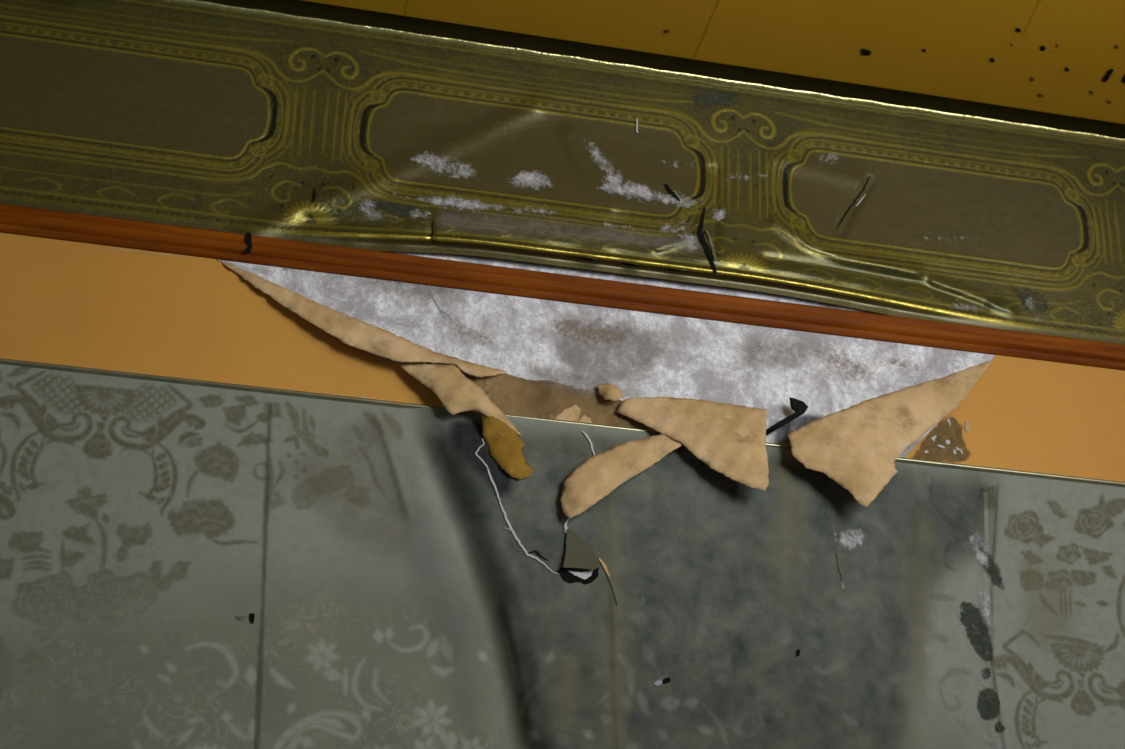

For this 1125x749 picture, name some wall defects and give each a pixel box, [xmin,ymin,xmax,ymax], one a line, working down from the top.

crack [582,431,595,456]
damp [778,417,819,443]
peeling [925,419,963,454]
crack [475,438,560,575]
peeling [840,530,863,549]
peeling [970,537,988,566]
damp [443,421,1005,749]